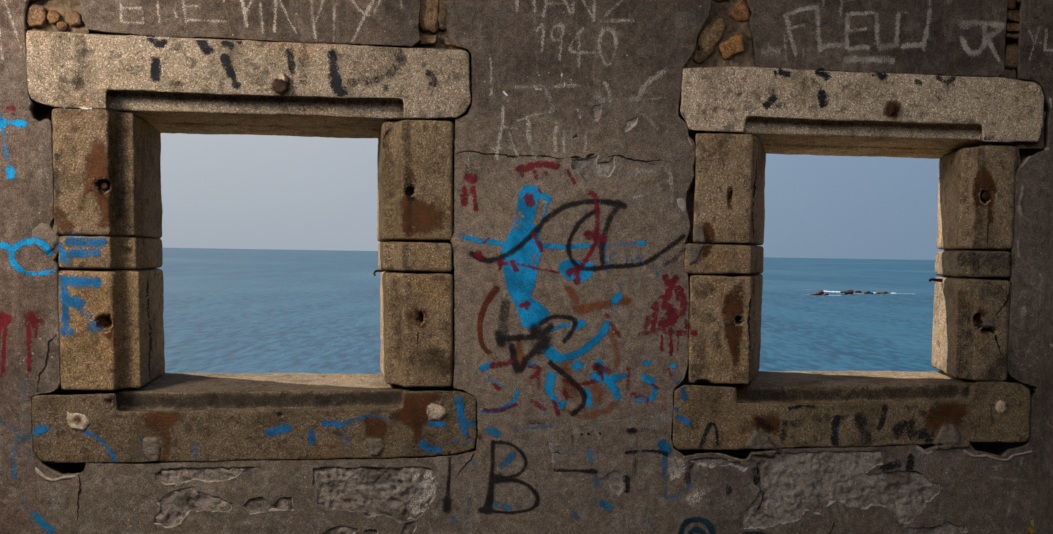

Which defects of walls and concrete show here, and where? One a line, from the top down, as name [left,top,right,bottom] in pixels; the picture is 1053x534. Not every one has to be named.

corrosion [79,143,110,227]
corrosion [401,172,443,234]
crack [456,150,667,165]
corrosion [972,167,997,224]
corrosion [722,283,743,377]
spalling [154,466,294,528]
spalling [312,466,440,534]
spalling [666,446,968,534]